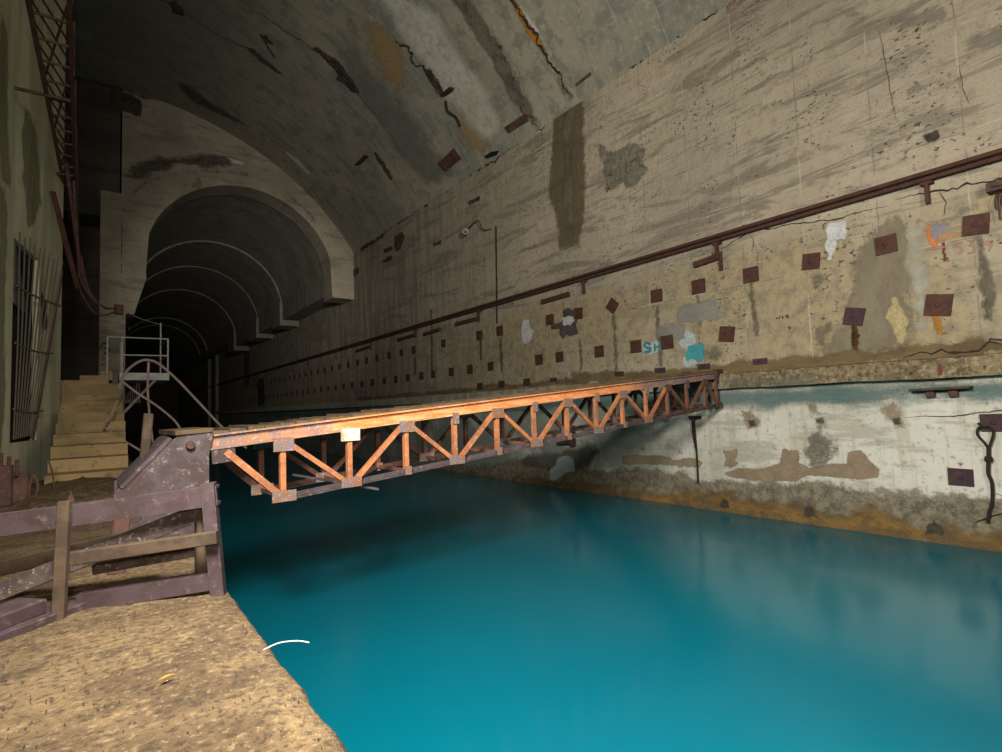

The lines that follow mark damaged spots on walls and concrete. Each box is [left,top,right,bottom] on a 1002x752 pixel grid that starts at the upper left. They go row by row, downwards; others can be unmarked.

spalling [313,47,360,94]
crack [510,0,573,98]
water stain [549,102,586,249]
spalling [599,143,647,192]
crack [712,177,1002,255]